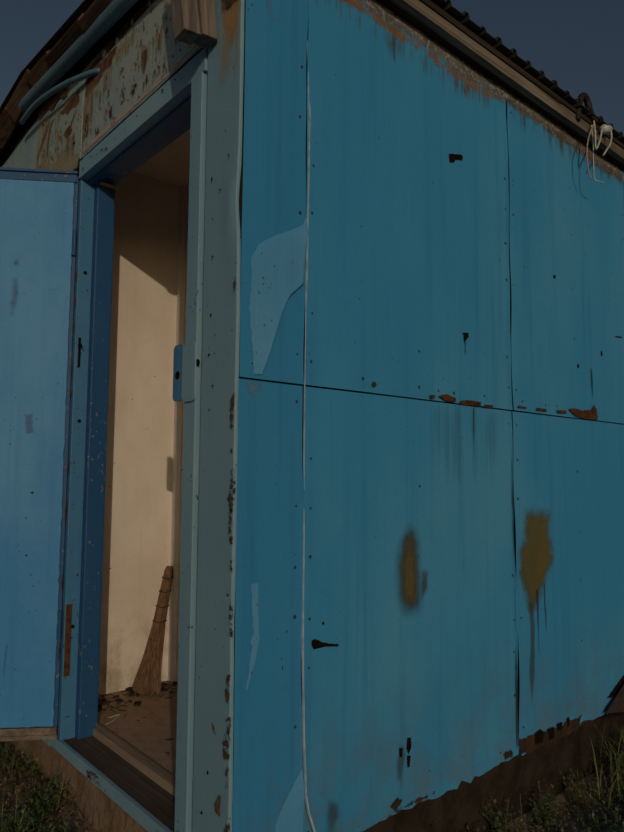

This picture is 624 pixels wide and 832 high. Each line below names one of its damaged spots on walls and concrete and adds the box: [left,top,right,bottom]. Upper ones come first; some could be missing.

corrosion [221,0,239,80]
corrosion [341,0,418,54]
corrosion [36,0,180,171]
peeling [227,469,236,544]
damp [402,536,426,607]
damp [521,513,553,629]
peeling [212,717,231,787]